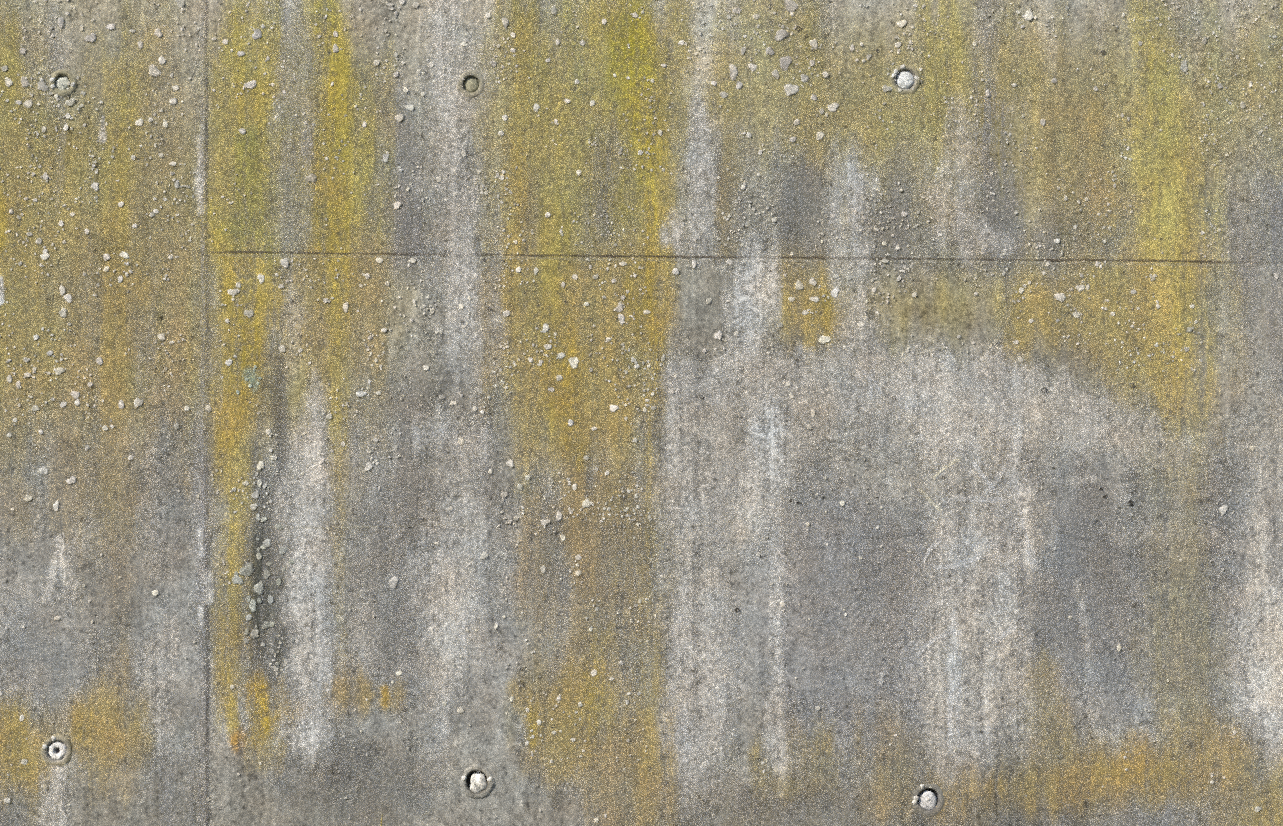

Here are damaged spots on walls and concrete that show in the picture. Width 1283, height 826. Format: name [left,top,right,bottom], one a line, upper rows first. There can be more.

leakage [0,34,18,106]
leakage [0,143,44,331]
leakage [100,82,134,236]
leakage [379,0,489,360]
leakage [587,7,684,136]
leakage [923,73,1024,296]
leakage [1076,169,1166,382]
leakage [1237,189,1283,380]
leakage [160,20,404,823]
leakage [353,406,490,737]
leakage [542,114,1140,814]
leakage [764,565,885,826]